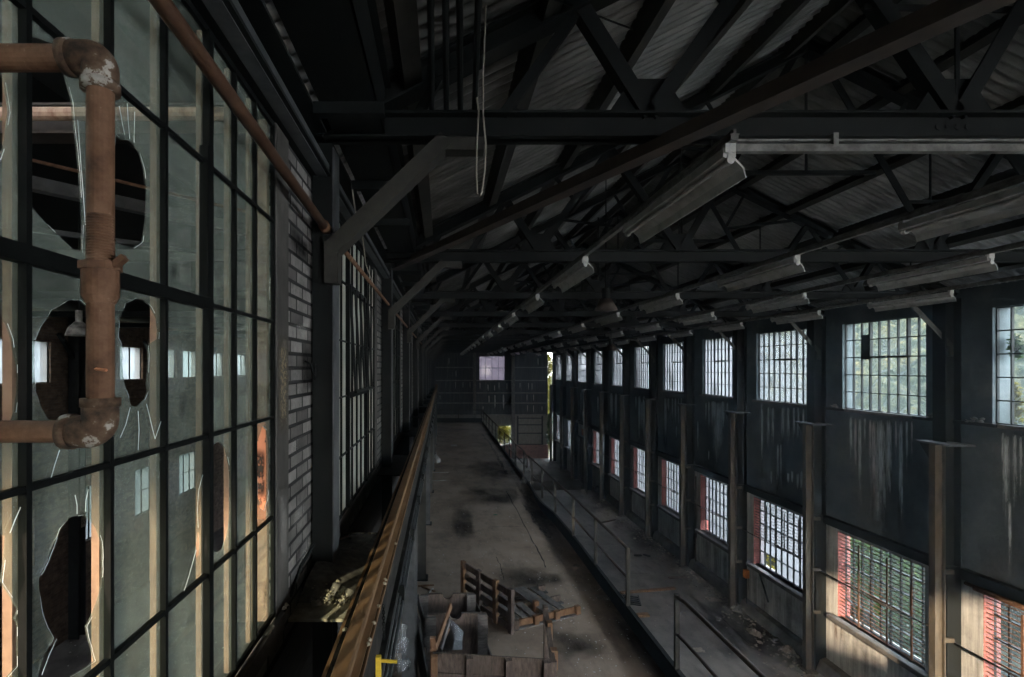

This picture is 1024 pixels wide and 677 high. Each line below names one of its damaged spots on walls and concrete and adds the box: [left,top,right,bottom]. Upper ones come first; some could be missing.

damp [850,419,913,509]
damp [1002,436,1022,545]